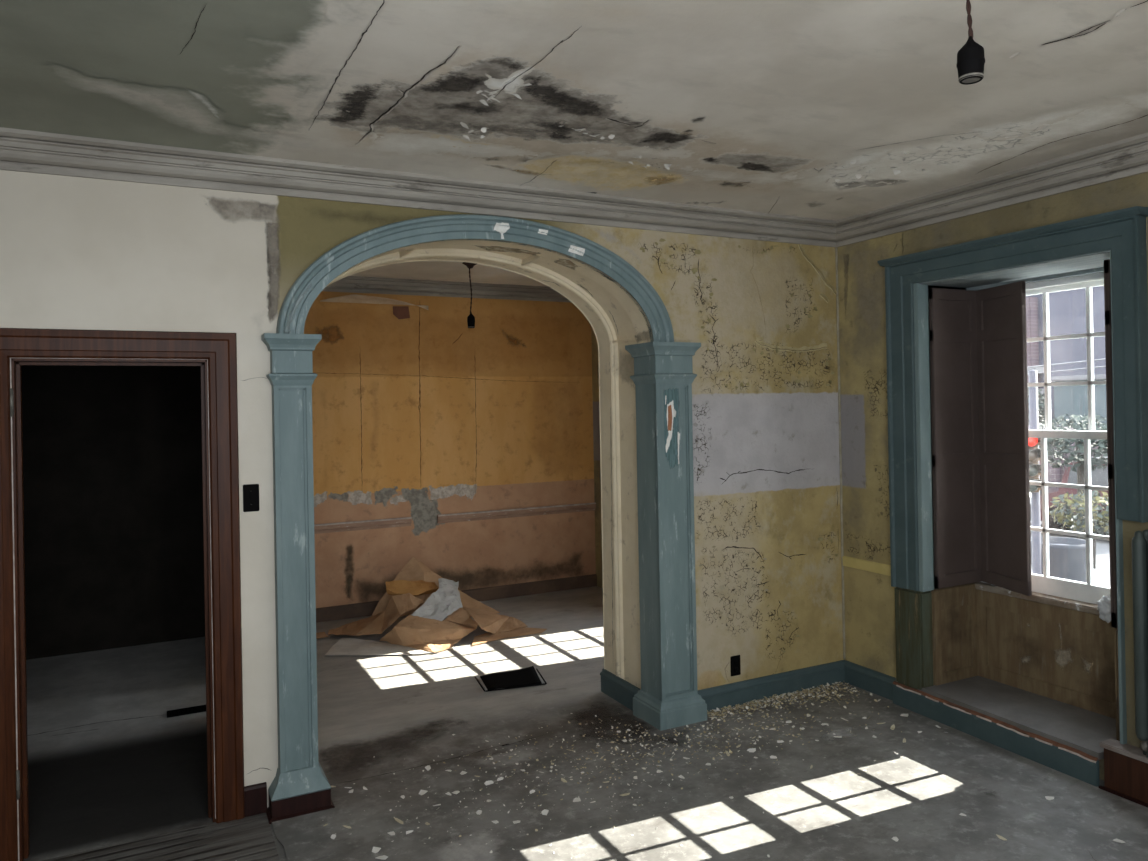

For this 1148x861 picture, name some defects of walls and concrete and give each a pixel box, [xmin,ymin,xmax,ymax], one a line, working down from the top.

crack [310,0,384,128]
crack [355,46,462,145]
crack [496,29,578,96]
water stain [307,41,1148,201]
crack [1010,0,1148,58]
crack [720,469,805,484]